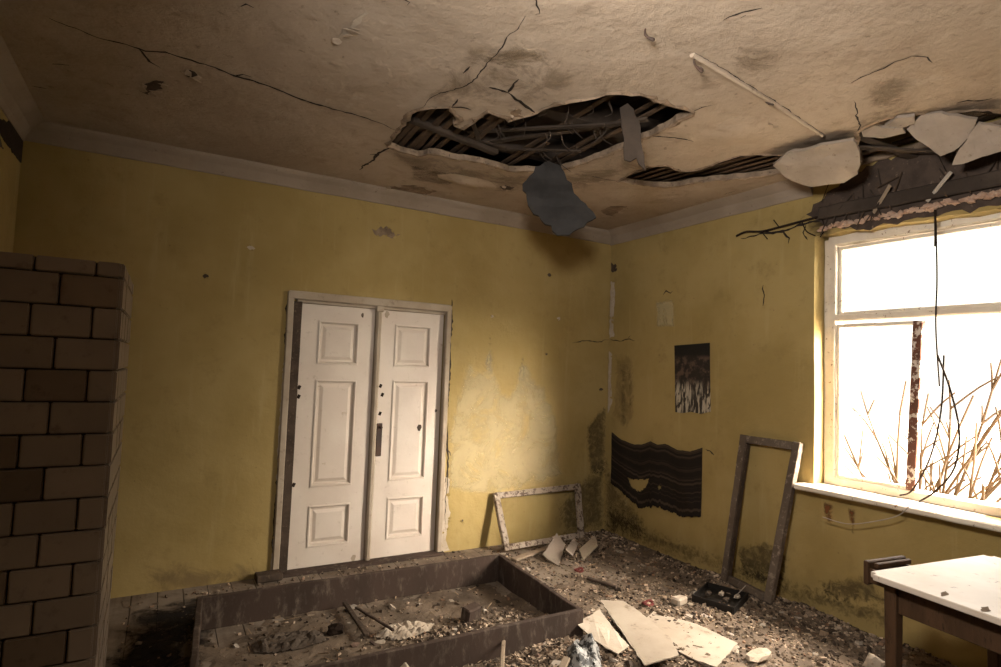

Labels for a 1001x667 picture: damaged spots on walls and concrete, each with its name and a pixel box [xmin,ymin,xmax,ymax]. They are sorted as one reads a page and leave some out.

crack [49,18,394,169]
crack [424,0,540,113]
crack [853,56,931,130]
peeling [386,184,436,197]
spalling [806,139,1001,235]